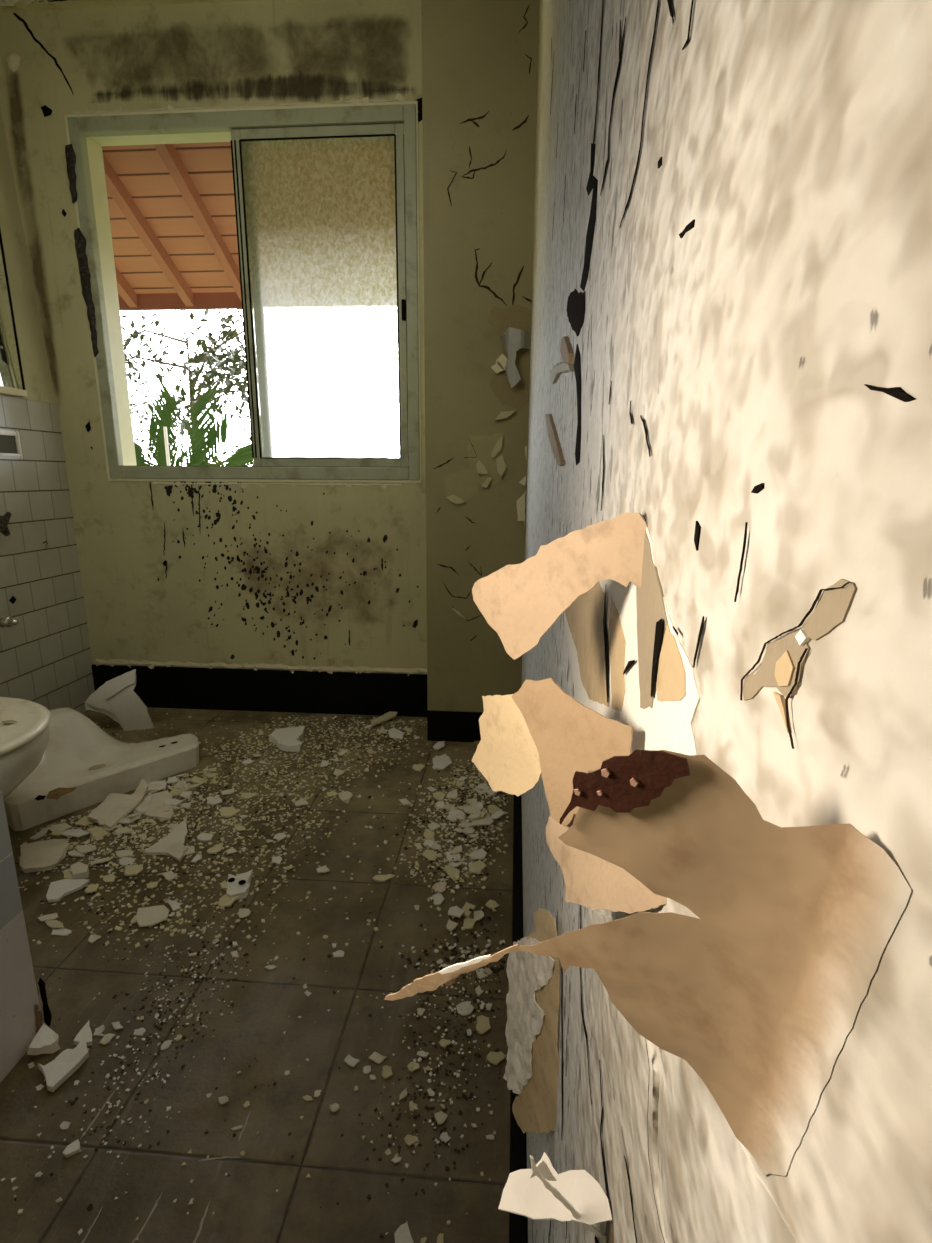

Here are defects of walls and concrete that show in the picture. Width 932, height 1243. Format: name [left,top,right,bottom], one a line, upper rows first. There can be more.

crack [13,0,74,95]
leakage [97,20,406,100]
crack [580,0,694,291]
crack [475,248,532,306]
leakage [149,481,419,660]
peeling [444,304,531,504]
peeling [516,476,526,531]
peeling [545,414,566,466]
crack [574,344,651,511]
peeling [384,512,912,1176]
crack [561,967,637,1243]
peeling [498,1152,614,1243]